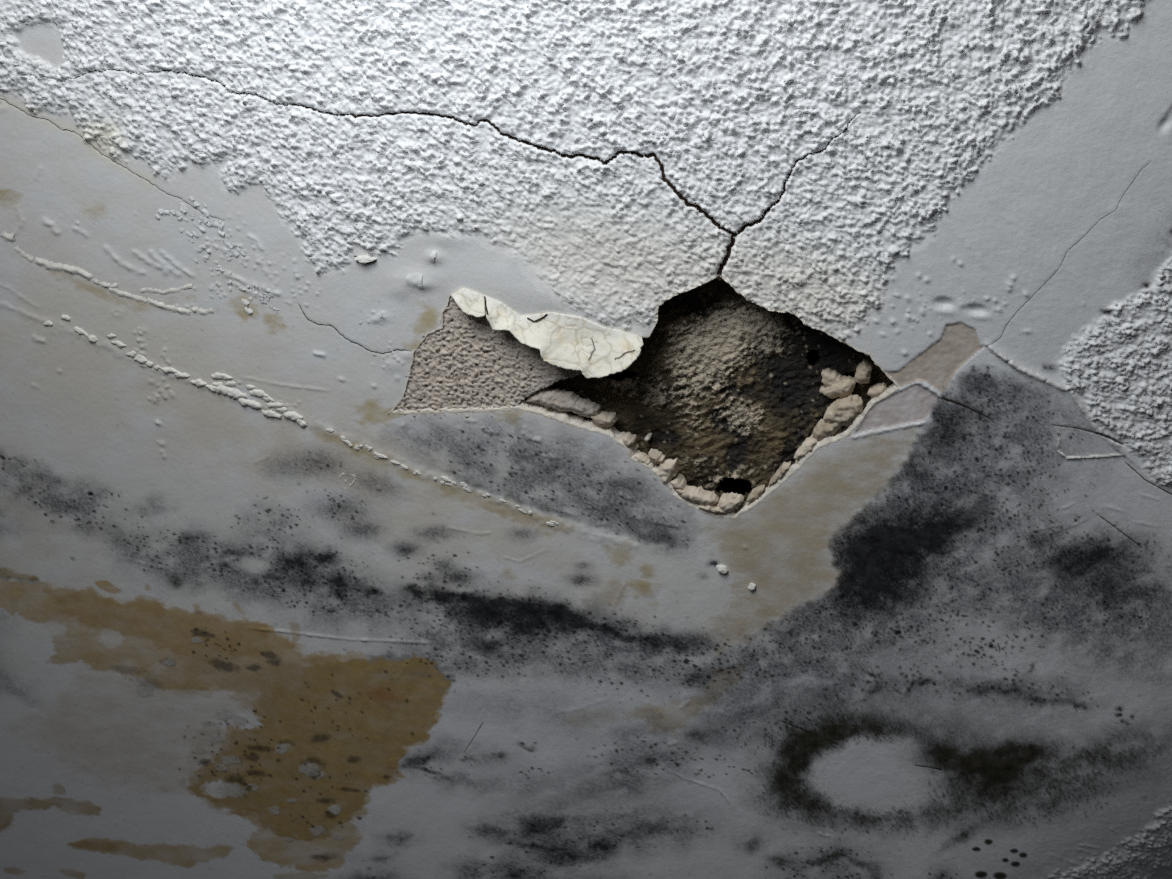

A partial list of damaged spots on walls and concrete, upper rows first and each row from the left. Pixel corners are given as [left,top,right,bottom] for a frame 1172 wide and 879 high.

crack [0,69,860,281]
spalling [387,274,982,519]
leakage [0,366,1172,879]